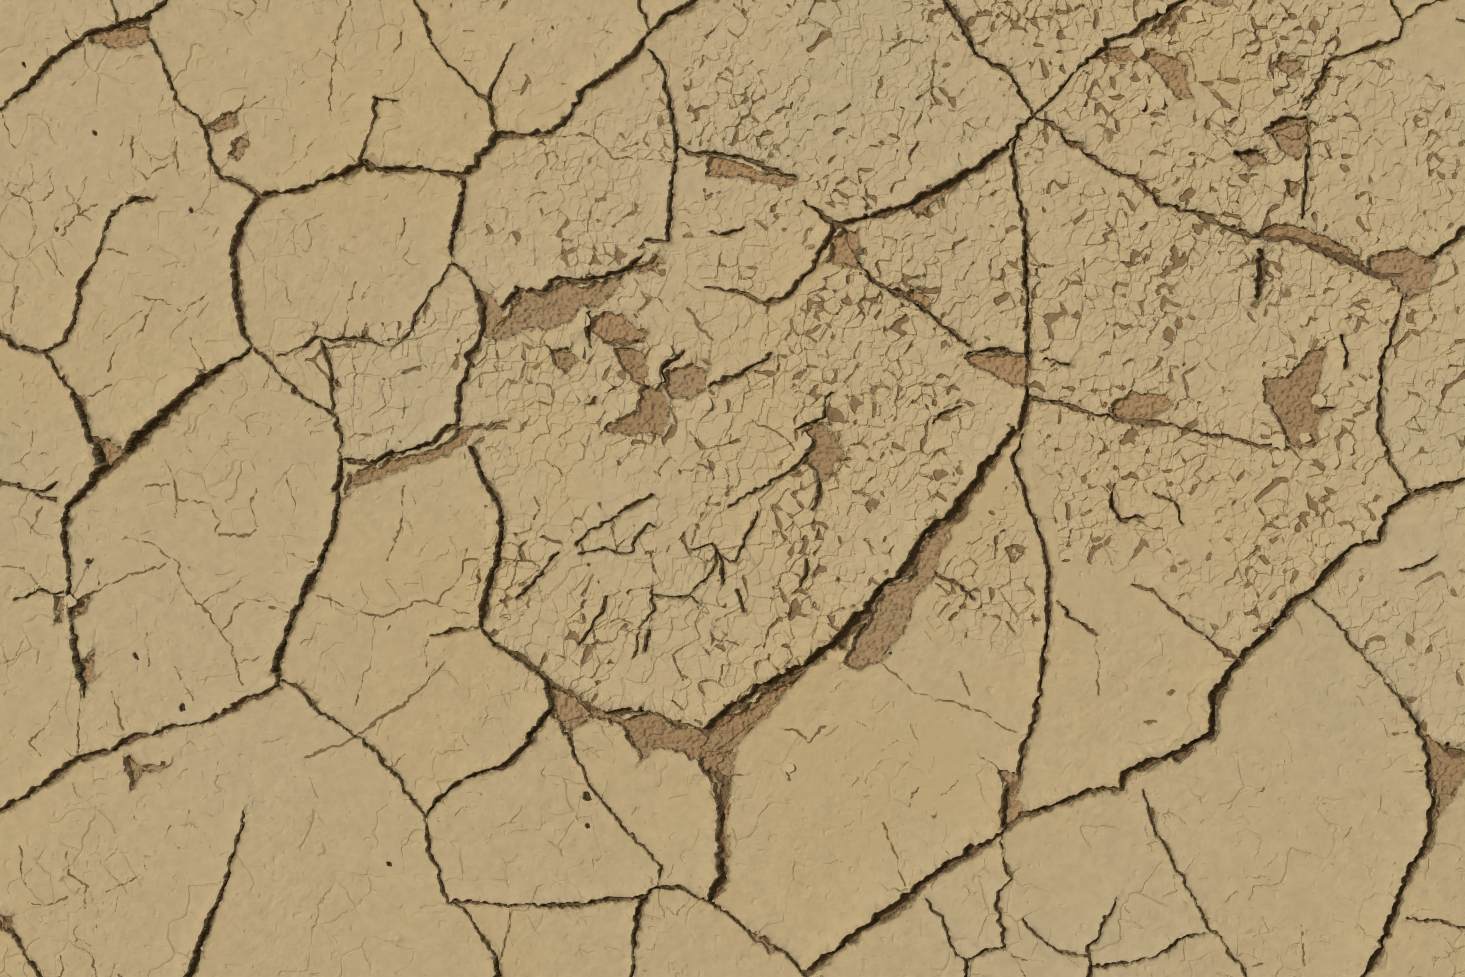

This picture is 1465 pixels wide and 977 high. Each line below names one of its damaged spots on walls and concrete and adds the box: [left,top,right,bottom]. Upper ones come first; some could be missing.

crack [1424,227,1465,264]
peeling [294,0,1465,870]
crack [648,0,1404,738]
crack [1,846,137,977]
crack [185,813,245,977]